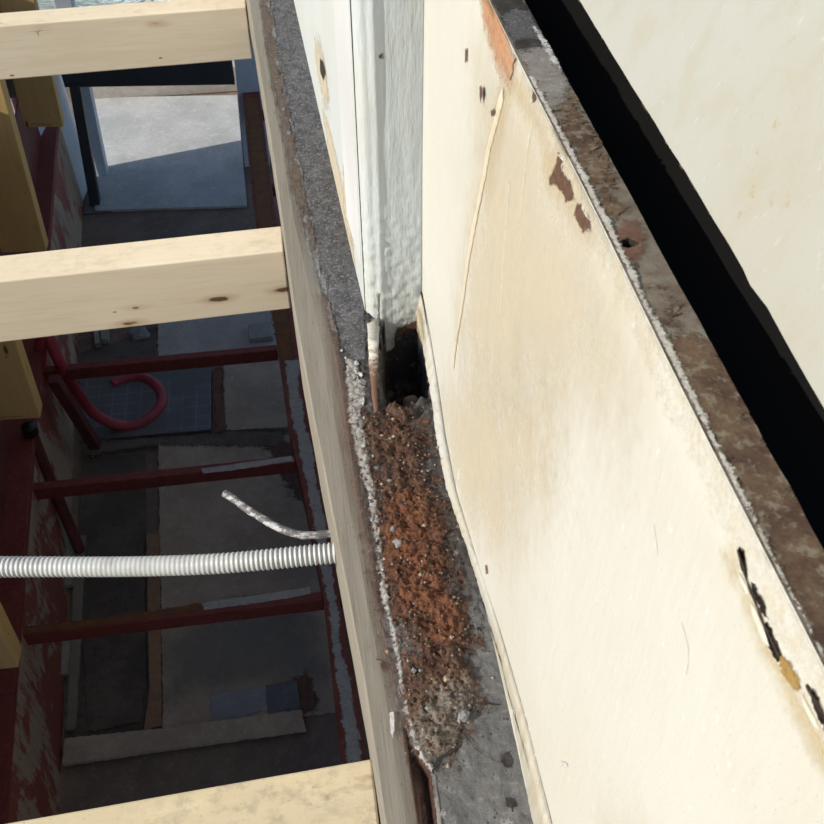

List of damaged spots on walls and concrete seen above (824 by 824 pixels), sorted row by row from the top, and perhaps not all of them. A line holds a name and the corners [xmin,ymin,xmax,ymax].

rust [453,0,515,367]
rust [551,87,630,221]
leakage [340,350,436,774]
crack [431,599,528,774]
rust [644,283,824,652]